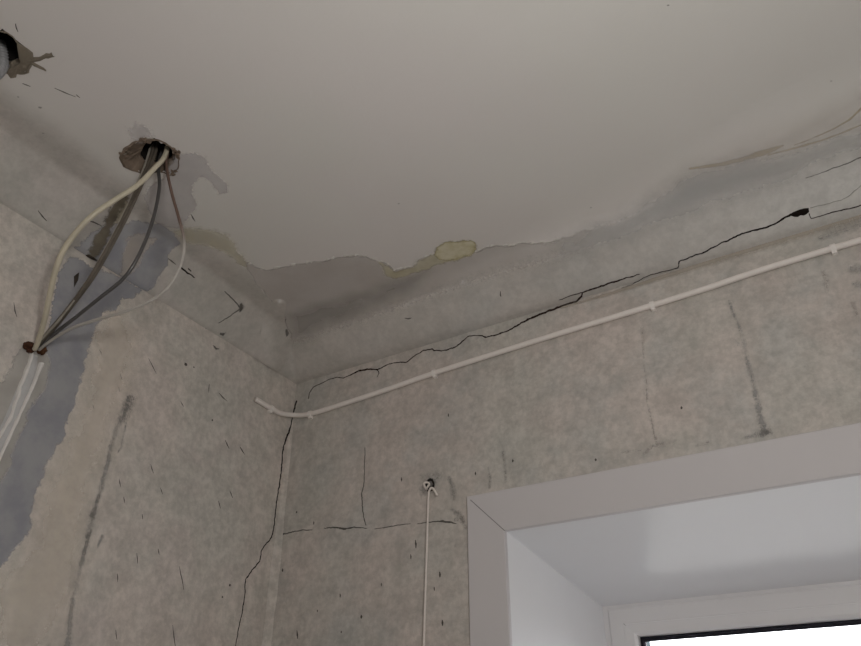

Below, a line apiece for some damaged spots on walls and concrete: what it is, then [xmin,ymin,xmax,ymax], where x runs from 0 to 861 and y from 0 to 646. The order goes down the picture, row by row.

spalling [0,29,21,61]
spalling [140,138,172,162]
flaking render [791,208,809,217]
peeling [244,231,596,340]
crack [235,185,861,646]